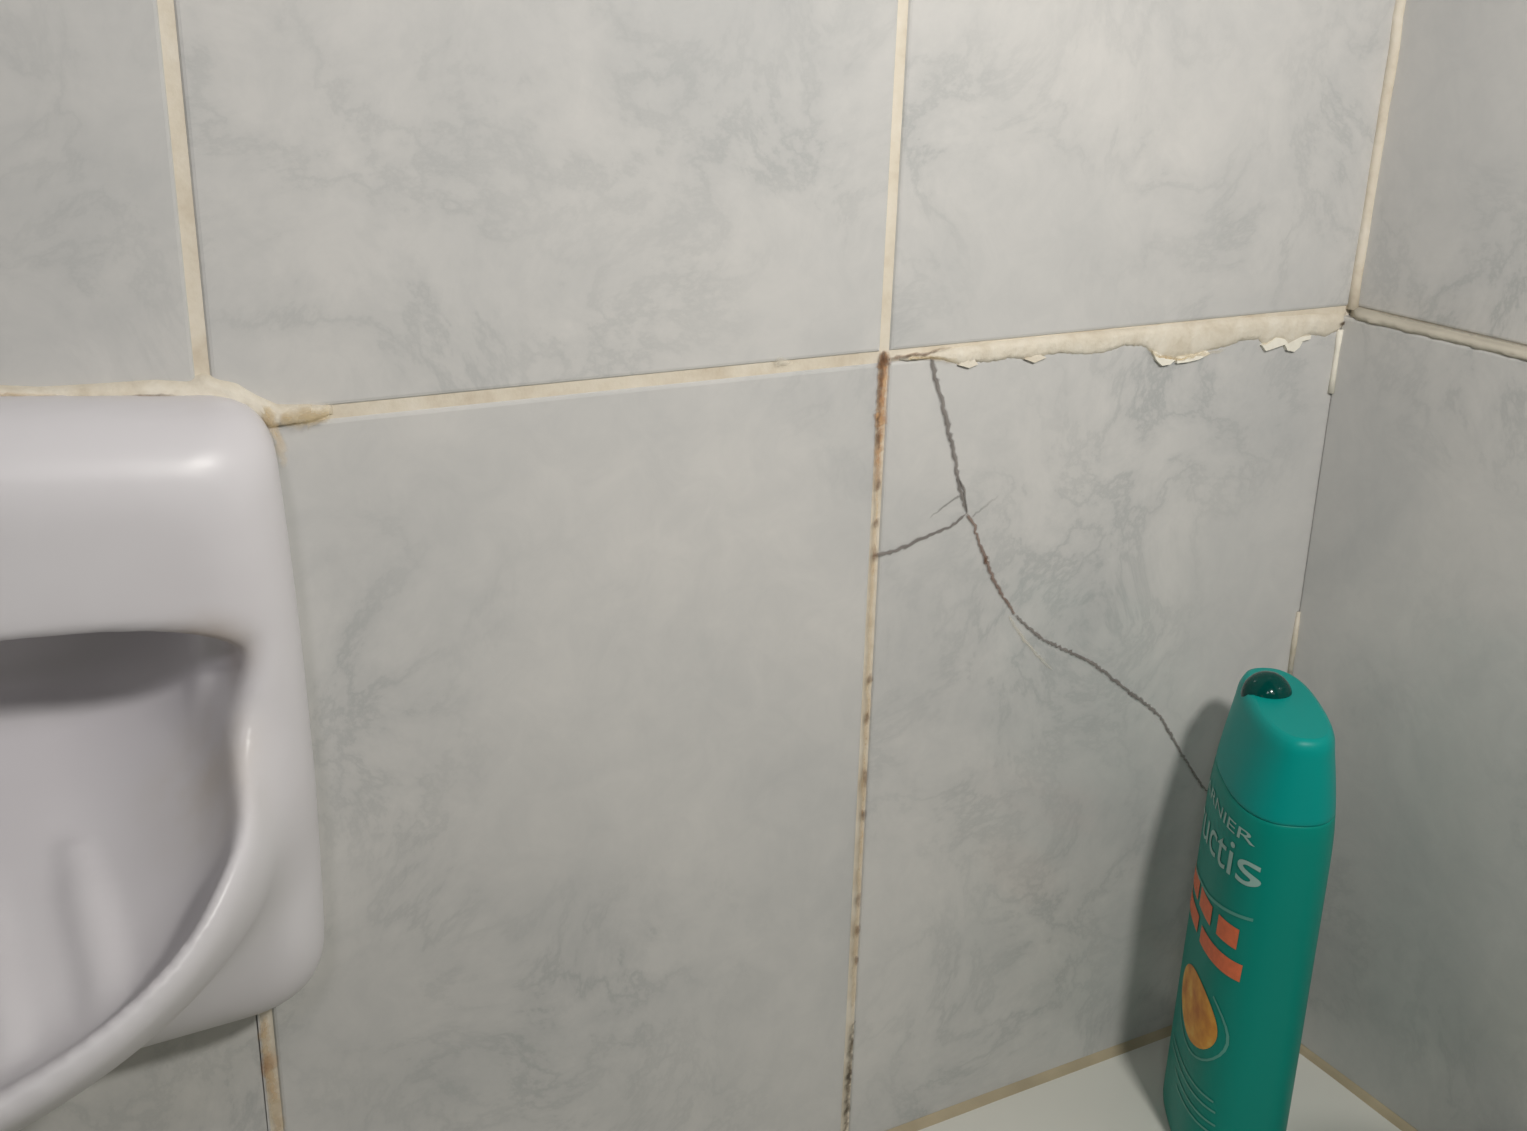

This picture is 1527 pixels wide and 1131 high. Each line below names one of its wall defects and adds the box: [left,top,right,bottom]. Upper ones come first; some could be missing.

corrosion [876,352,888,486]
peeling [1151,351,1210,366]
peeling [1260,335,1311,352]
crack [877,358,1208,791]